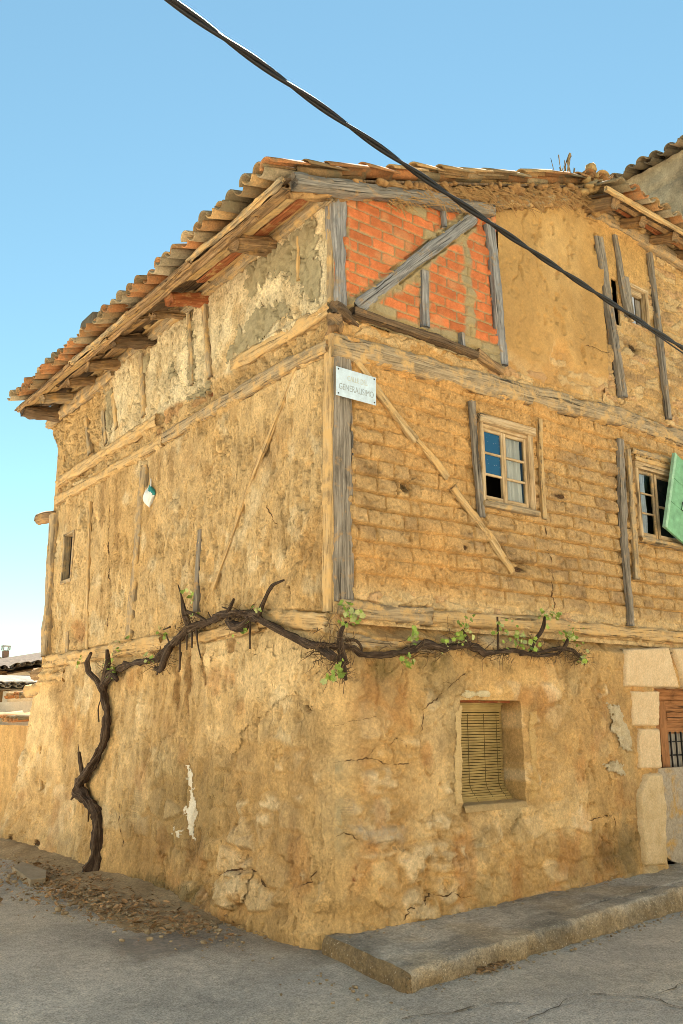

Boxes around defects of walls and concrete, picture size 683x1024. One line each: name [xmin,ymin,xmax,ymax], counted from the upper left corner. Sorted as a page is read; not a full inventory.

crack [334,673,465,765]
peeling [171,765,198,840]
crack [219,858,269,888]
crack [403,892,469,921]